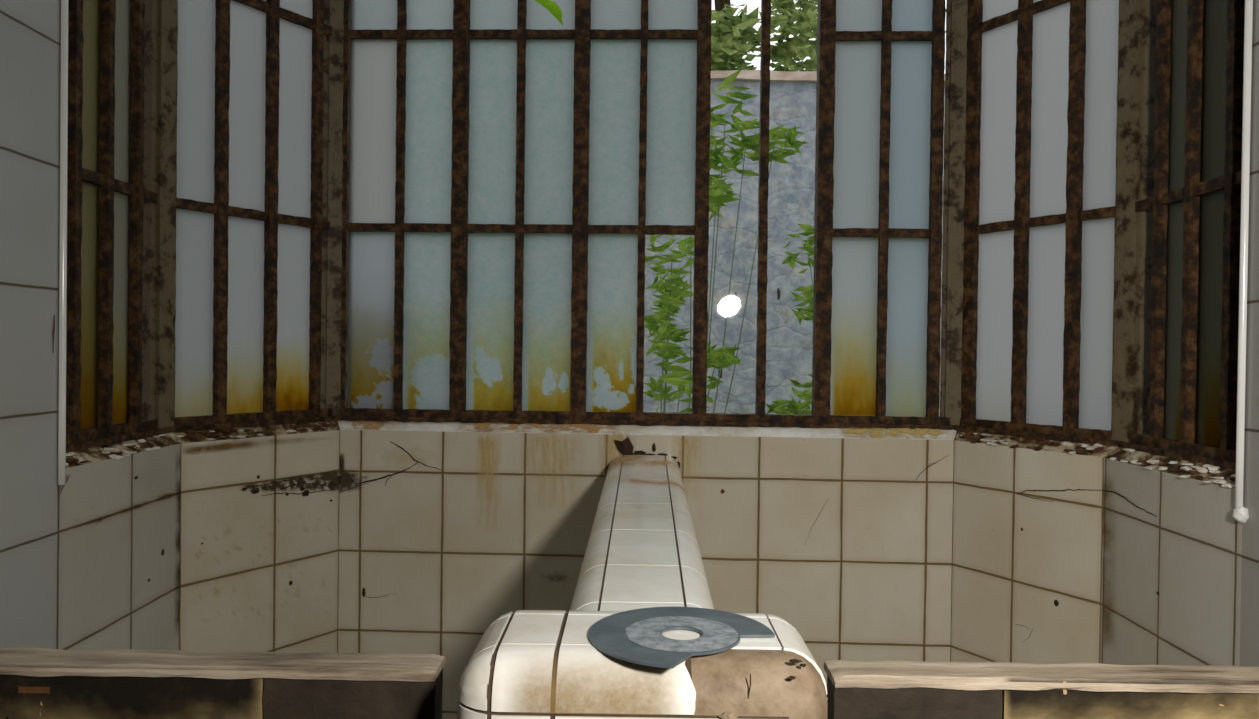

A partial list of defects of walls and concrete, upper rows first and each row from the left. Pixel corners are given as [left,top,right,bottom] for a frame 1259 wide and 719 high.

spalling [59,451,90,496]
spalling [102,422,329,460]
crack [356,441,441,487]
spalling [959,431,1236,488]
damp [0,674,256,719]